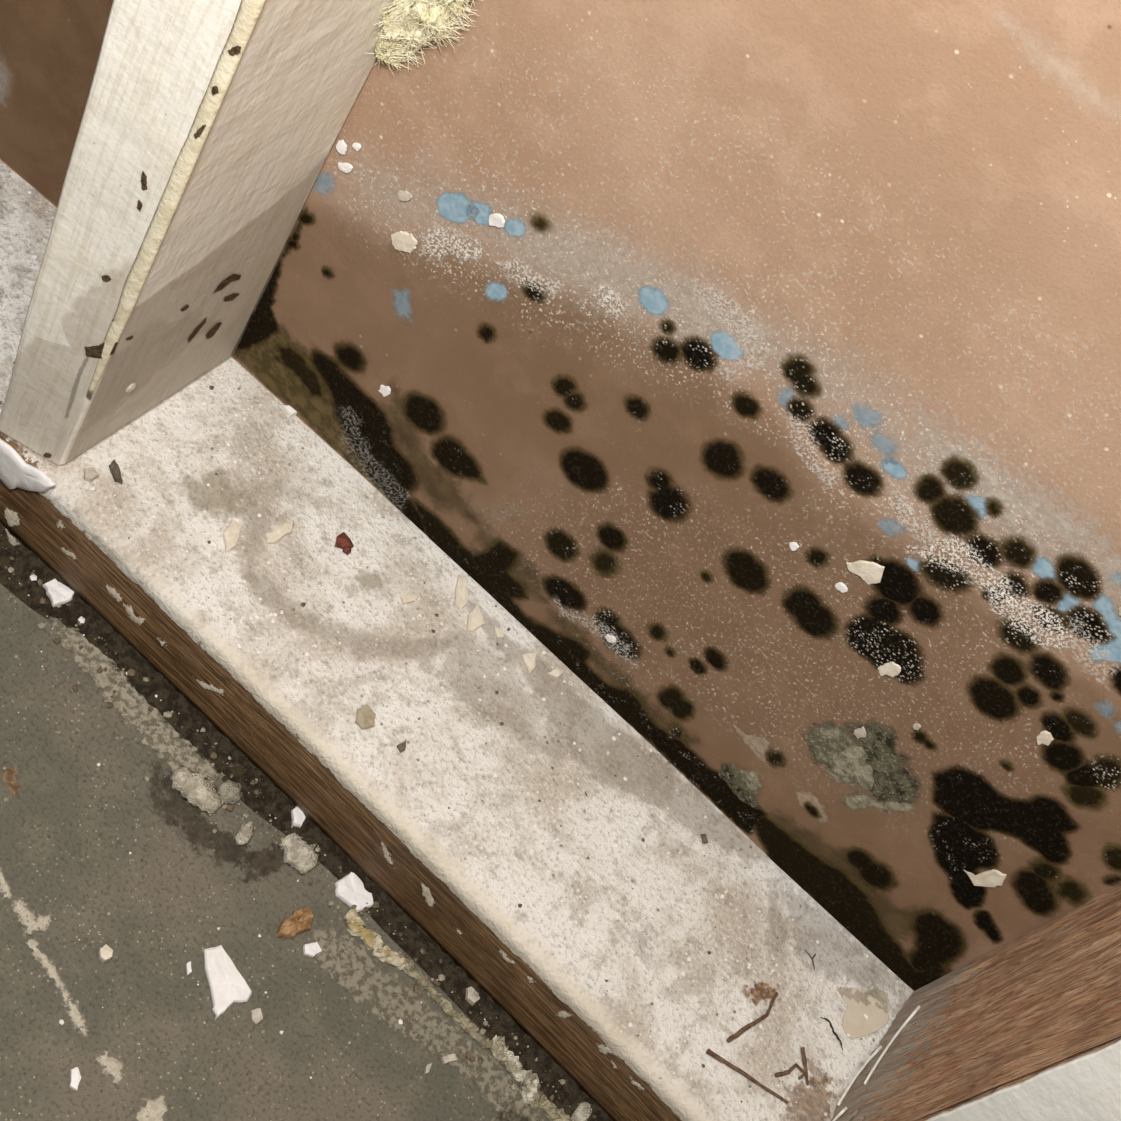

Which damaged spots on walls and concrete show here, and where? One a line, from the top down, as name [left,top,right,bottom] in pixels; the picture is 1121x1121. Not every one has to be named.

water stain [232,145,1121,991]
peeling [854,727,866,739]
crack [820,1017,843,1051]